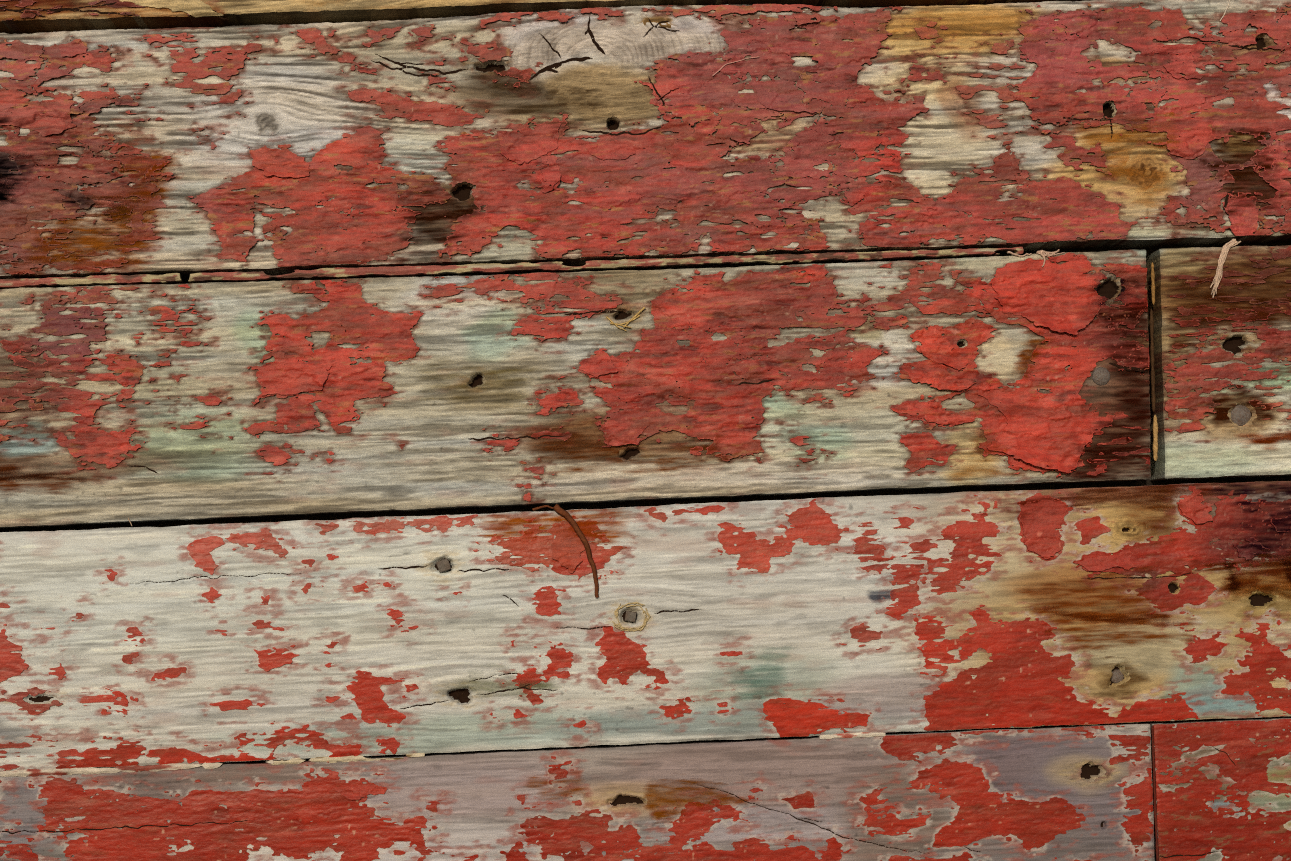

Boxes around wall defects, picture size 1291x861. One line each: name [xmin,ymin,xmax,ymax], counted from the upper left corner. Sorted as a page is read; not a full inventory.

crack [371,54,467,77]
crack [530,16,605,80]
crack [643,18,679,37]
water stain [0,159,26,200]
peeling [0,36,211,470]
peeling [188,2,1291,477]
corrosion [1206,554,1291,590]
corrosion [1038,587,1169,647]
peeling [593,626,669,690]
peeling [717,486,1291,861]
peeling [0,721,455,861]
peeling [500,799,852,861]